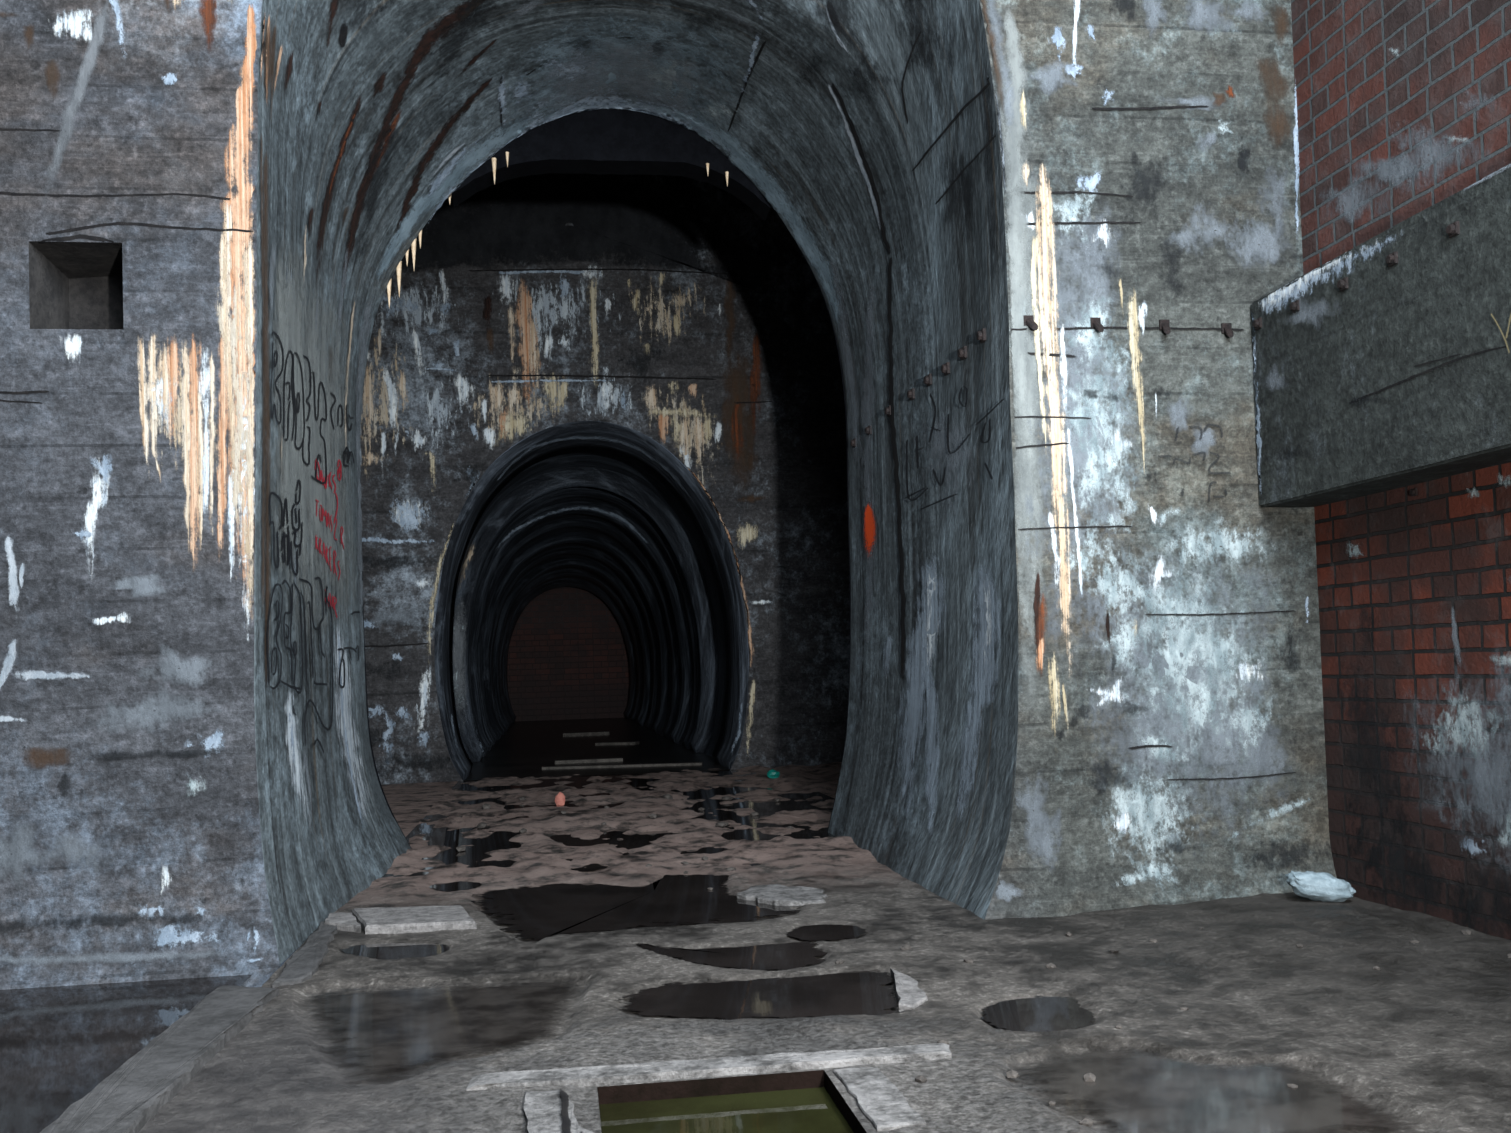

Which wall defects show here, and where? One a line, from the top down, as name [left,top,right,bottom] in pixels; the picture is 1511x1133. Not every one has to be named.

damp [49,0,124,176]
damp [162,73,177,85]
damp [818,0,891,97]
rust [303,0,496,292]
efflorescence [1241,87,1300,261]
damp [944,0,1284,885]
rust [1033,574,1045,669]
damp [1281,596,1309,668]
damp [883,558,946,831]
efflorescence [996,884,1016,900]
damp [1258,800,1304,821]
damp [1253,841,1328,869]